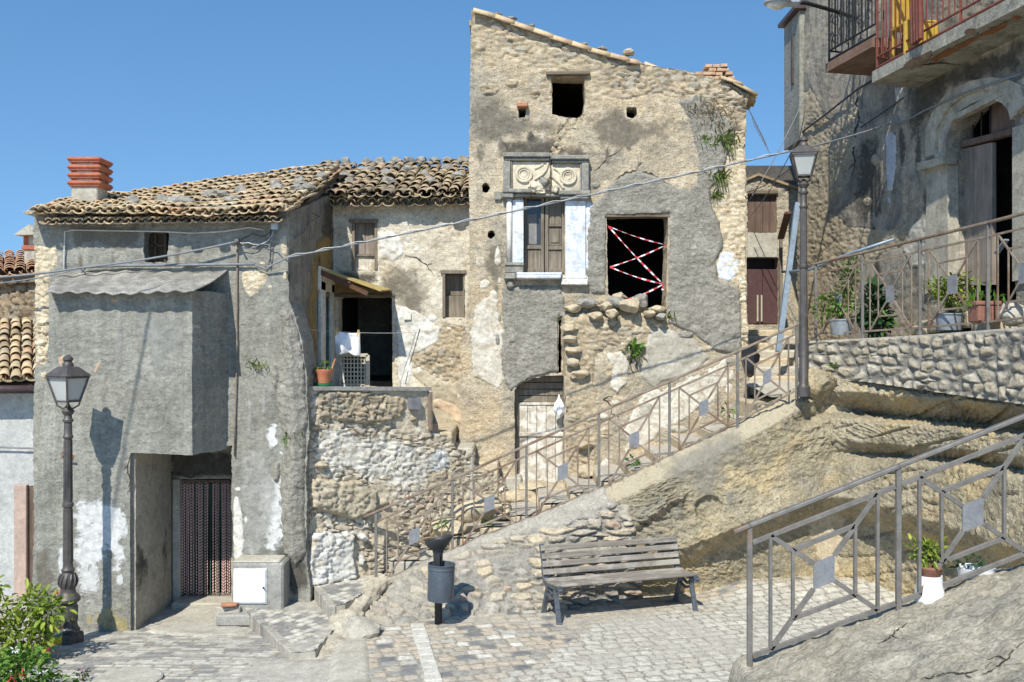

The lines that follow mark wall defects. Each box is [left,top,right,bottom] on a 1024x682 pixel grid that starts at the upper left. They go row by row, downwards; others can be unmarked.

spalling [471,13,748,347]
crack [848,81,866,177]
spalling [242,262,272,297]
peeling [311,245,505,518]
spalling [563,292,736,476]
peeling [265,424,282,454]
peeling [58,498,128,603]